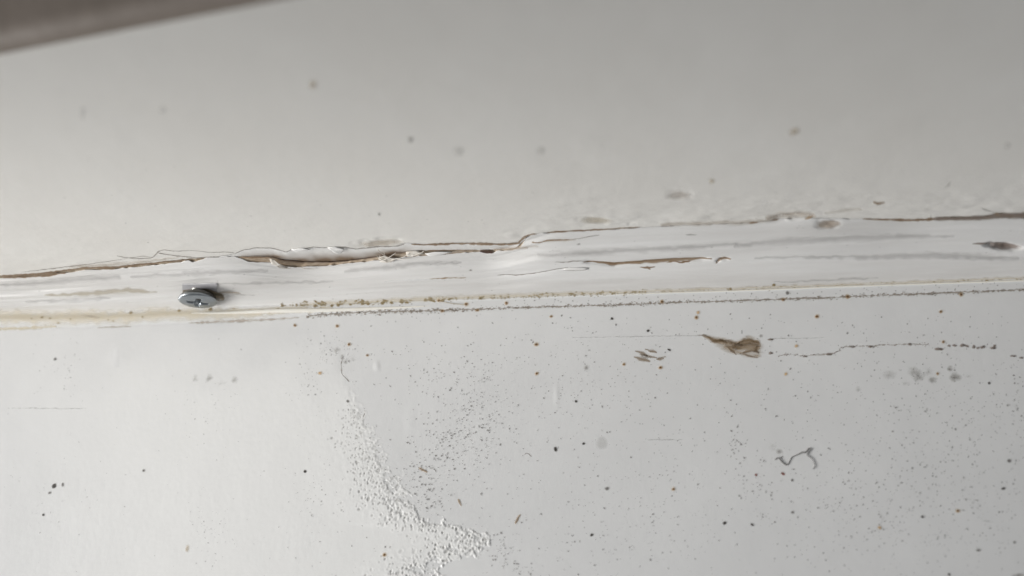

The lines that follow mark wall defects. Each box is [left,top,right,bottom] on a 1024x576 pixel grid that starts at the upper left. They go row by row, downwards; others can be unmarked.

crack [856,208,1024,221]
crack [0,227,731,278]
peeling [0,333,492,576]